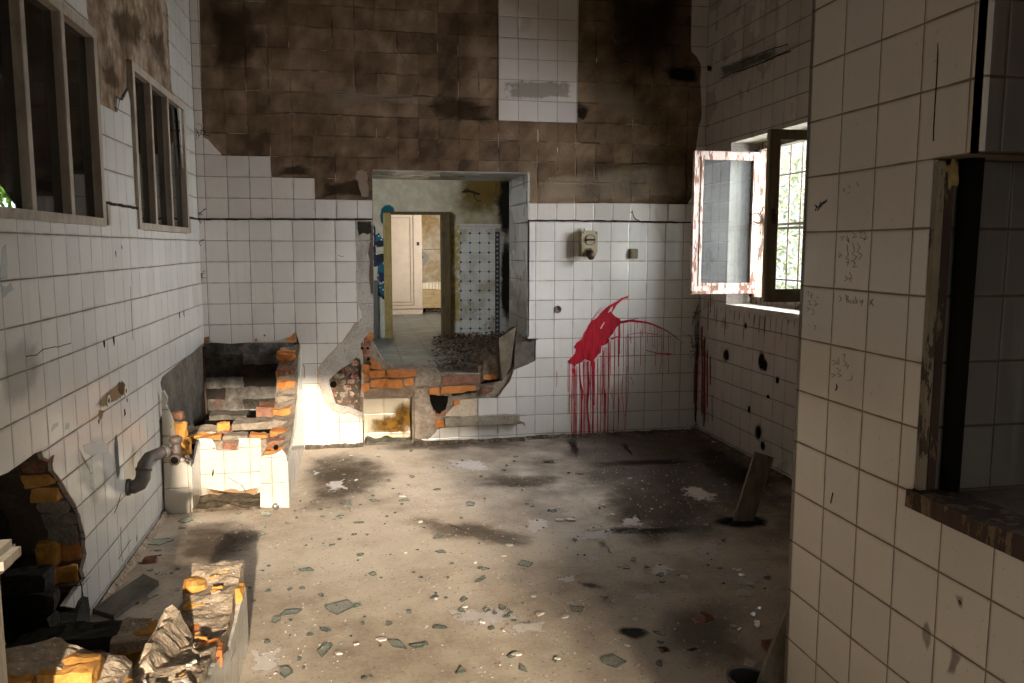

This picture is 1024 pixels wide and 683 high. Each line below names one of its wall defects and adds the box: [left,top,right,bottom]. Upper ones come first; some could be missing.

peeling [86,0,173,111]
peeling [199,0,702,204]
water stain [463,180,509,319]
spalling [513,331,537,369]
spalling [0,450,90,649]